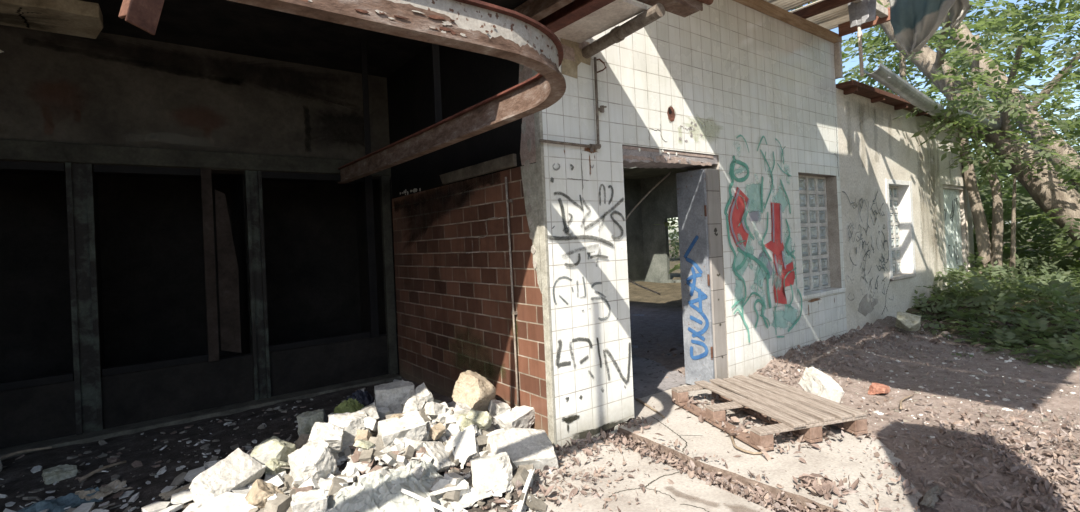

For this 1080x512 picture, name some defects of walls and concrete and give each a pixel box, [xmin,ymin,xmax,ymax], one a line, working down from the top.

peeling [301,0,591,83]